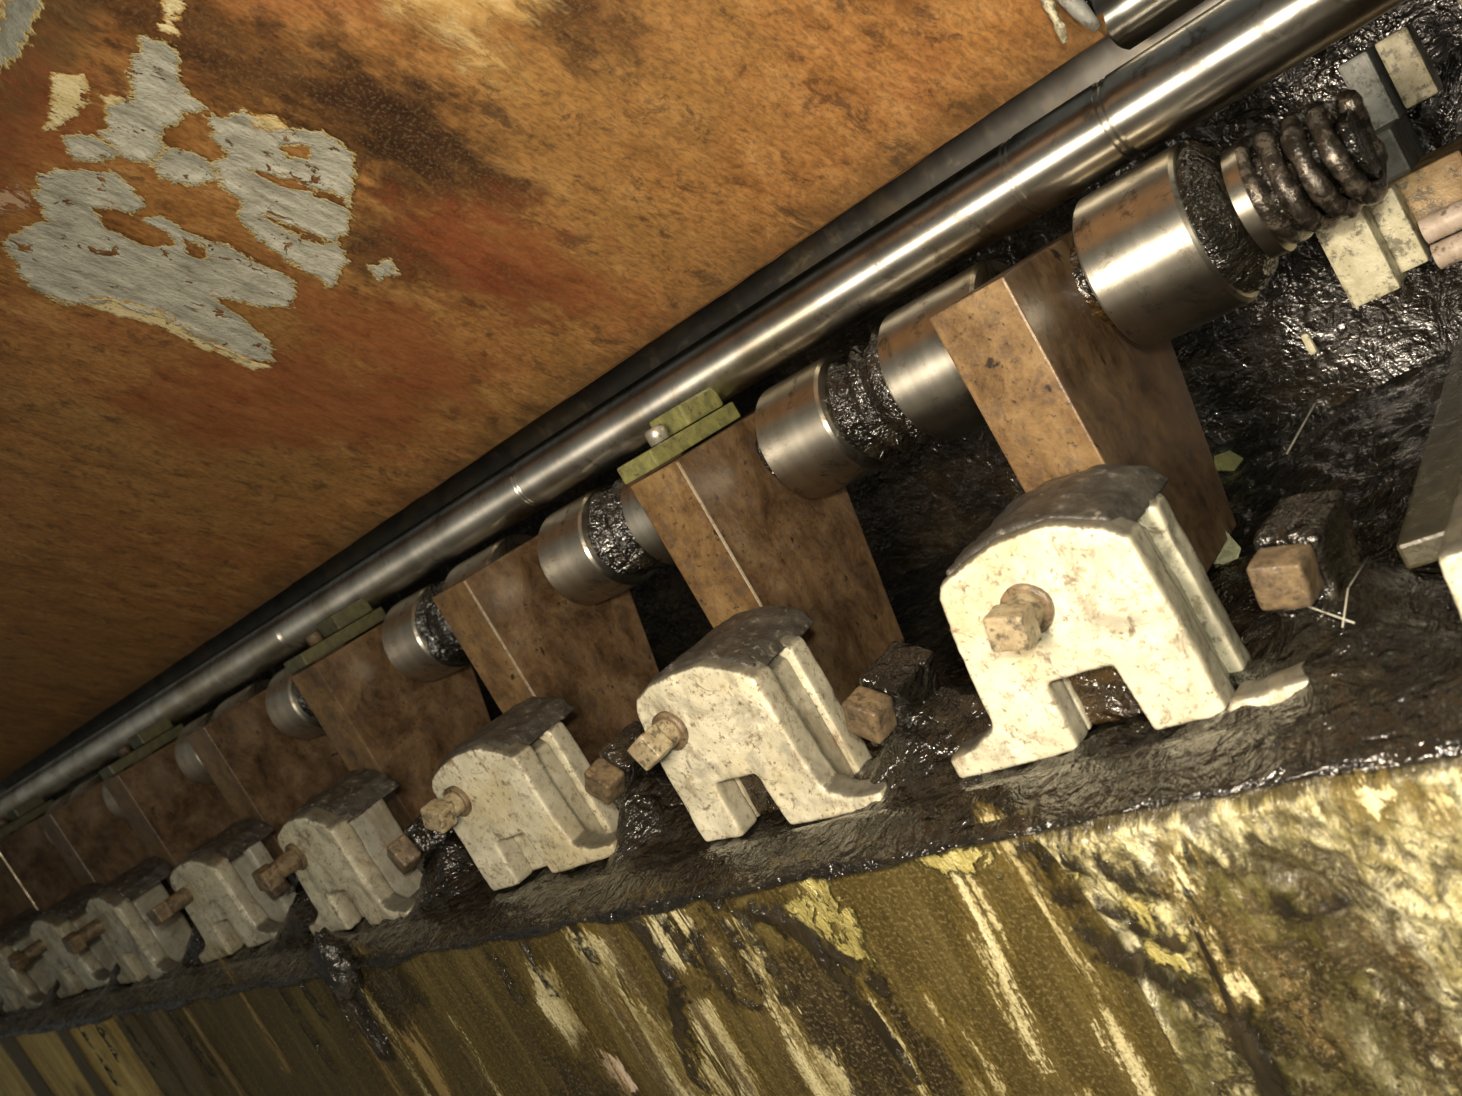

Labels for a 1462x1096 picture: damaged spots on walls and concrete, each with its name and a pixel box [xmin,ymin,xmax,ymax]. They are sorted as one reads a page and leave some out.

corrosion [383,0,542,85]
peeling [0,0,402,371]
leakage [975,803,1004,823]
leakage [0,1024,53,1096]
leakage [48,1011,113,1096]
leakage [105,988,246,1096]
leakage [358,985,453,1096]
leakage [522,909,860,1096]
leakage [855,985,931,1096]
leakage [915,983,1011,1096]
leakage [941,850,1095,1096]
leakage [984,837,1162,1096]